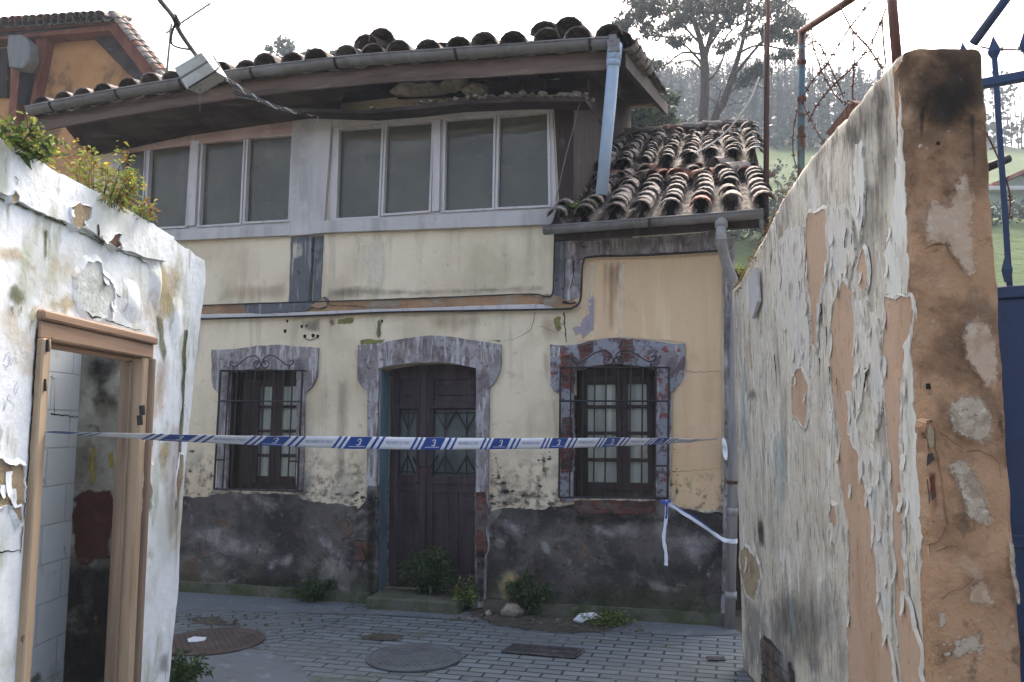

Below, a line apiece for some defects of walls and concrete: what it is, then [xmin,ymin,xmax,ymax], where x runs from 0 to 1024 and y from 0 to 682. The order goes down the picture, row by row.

spalling [64,201,92,233]
peeling [71,232,125,325]
leakage [90,358,114,400]
peeling [561,296,595,389]
peeling [772,79,949,682]
spalling [0,453,27,530]
leakage [490,458,557,507]
leakage [306,486,375,595]
peeling [739,543,763,603]